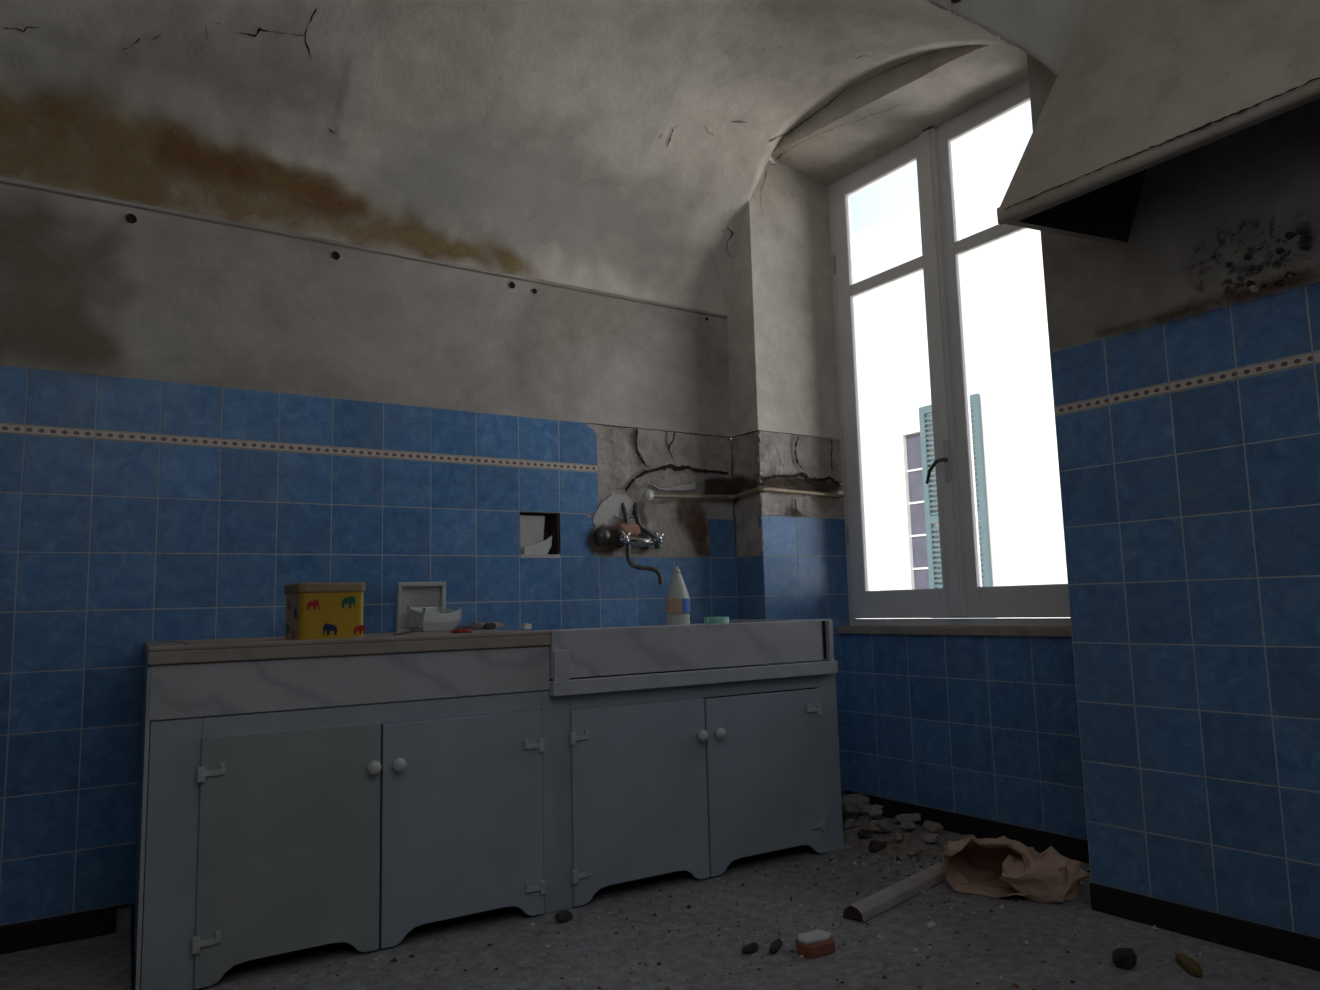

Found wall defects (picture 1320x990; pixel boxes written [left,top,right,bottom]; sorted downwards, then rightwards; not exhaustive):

crack [206,8,317,59]
water stain [0,94,526,272]
spalling [586,423,844,557]